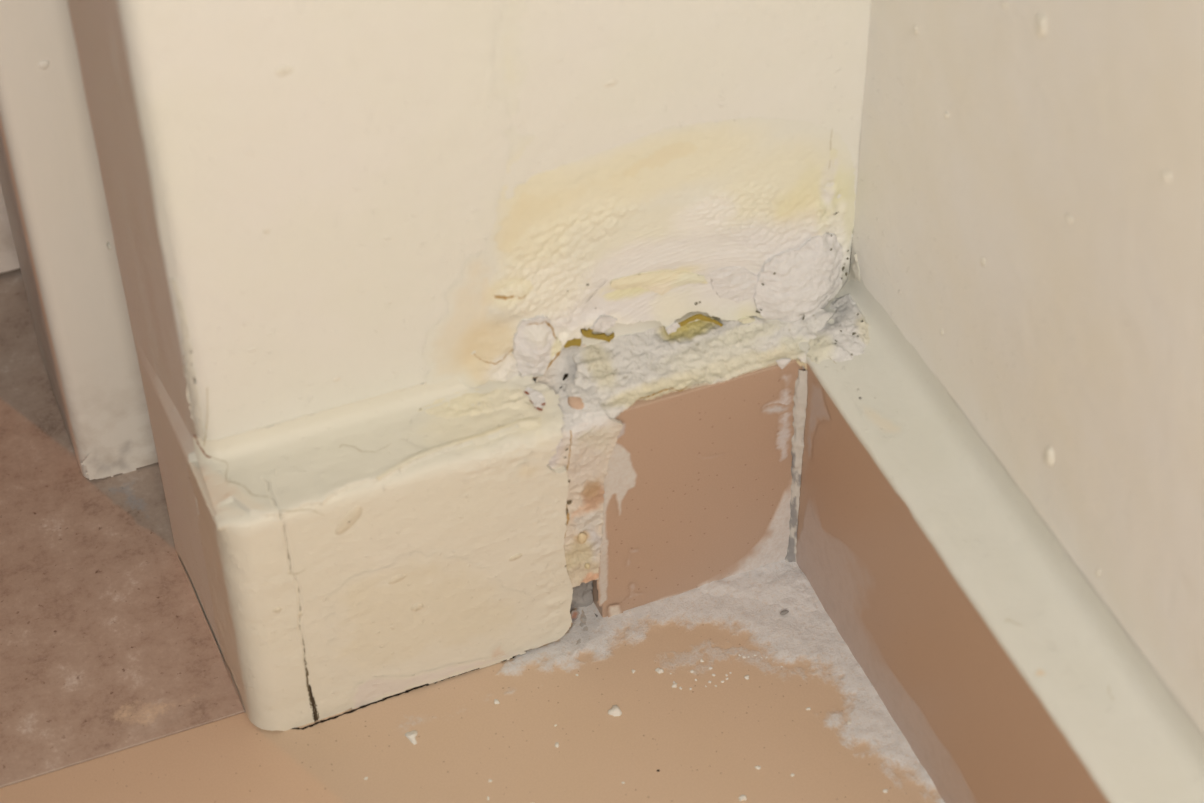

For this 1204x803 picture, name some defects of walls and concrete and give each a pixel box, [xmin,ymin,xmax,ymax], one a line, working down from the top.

water stain [400,129,720,483]
peeling [482,117,856,587]
water stain [768,148,855,250]
water stain [806,254,870,364]
crack [191,388,324,722]